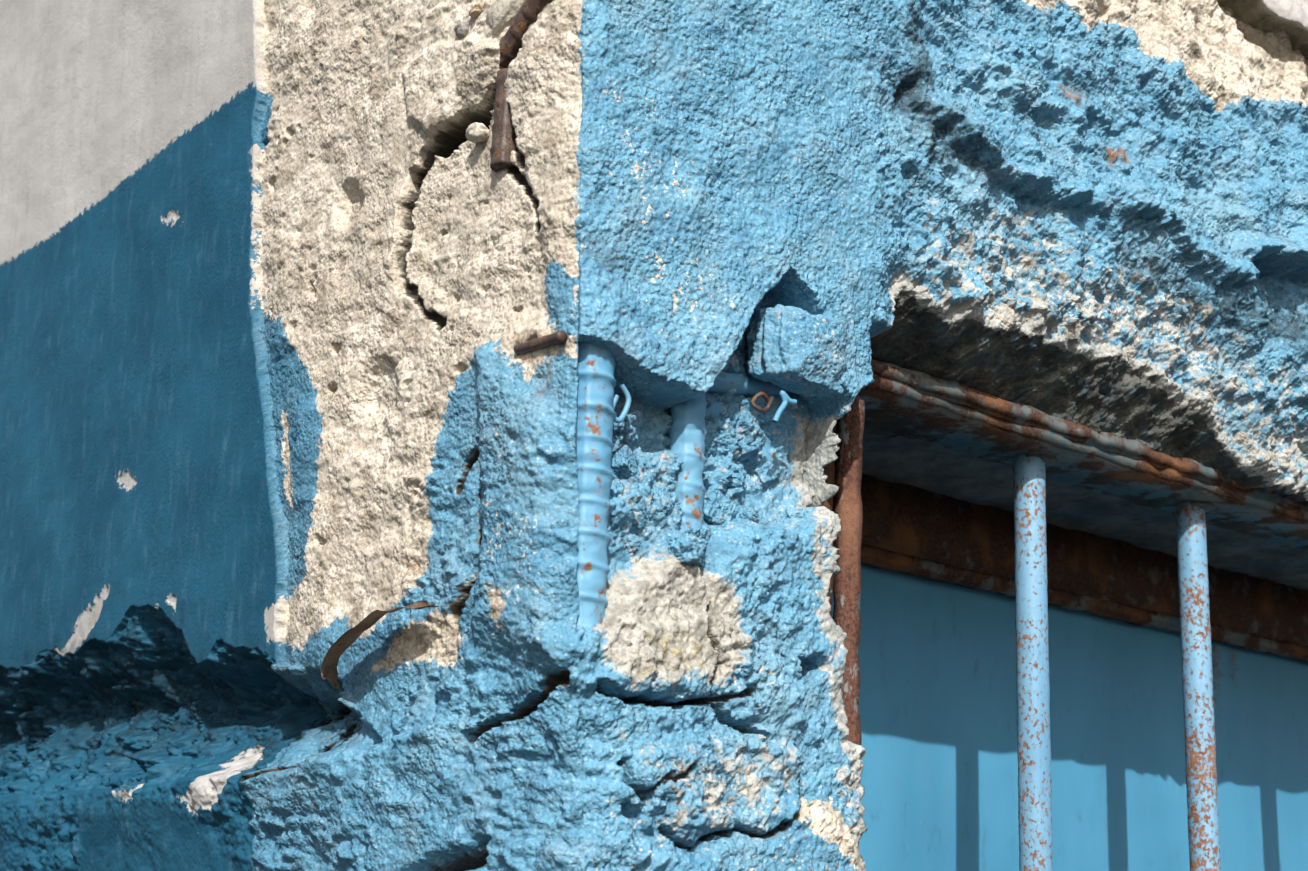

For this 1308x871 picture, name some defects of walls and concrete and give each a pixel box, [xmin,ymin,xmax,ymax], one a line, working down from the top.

crack [389,26,543,331]
spalling [1022,0,1308,111]
spalling [0,0,855,818]
spalling [907,269,1308,495]
crack [459,602,809,853]